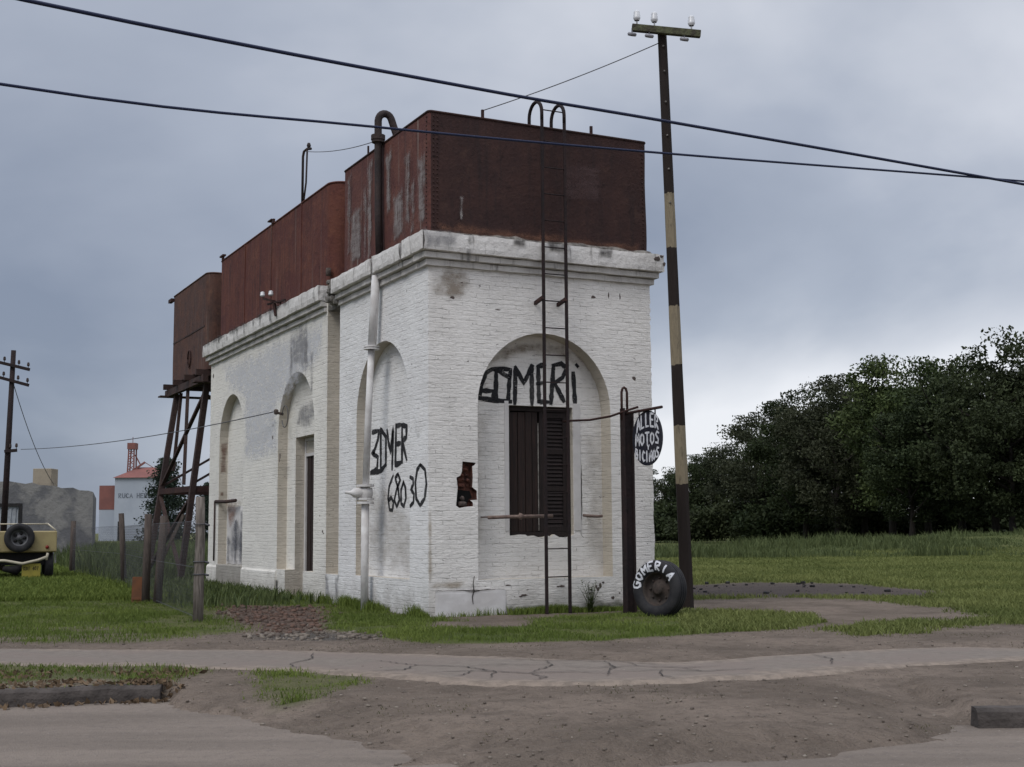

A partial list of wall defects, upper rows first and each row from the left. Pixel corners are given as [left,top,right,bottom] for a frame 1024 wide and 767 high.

leakage [442,273,463,295]
spalling [456,461,477,508]